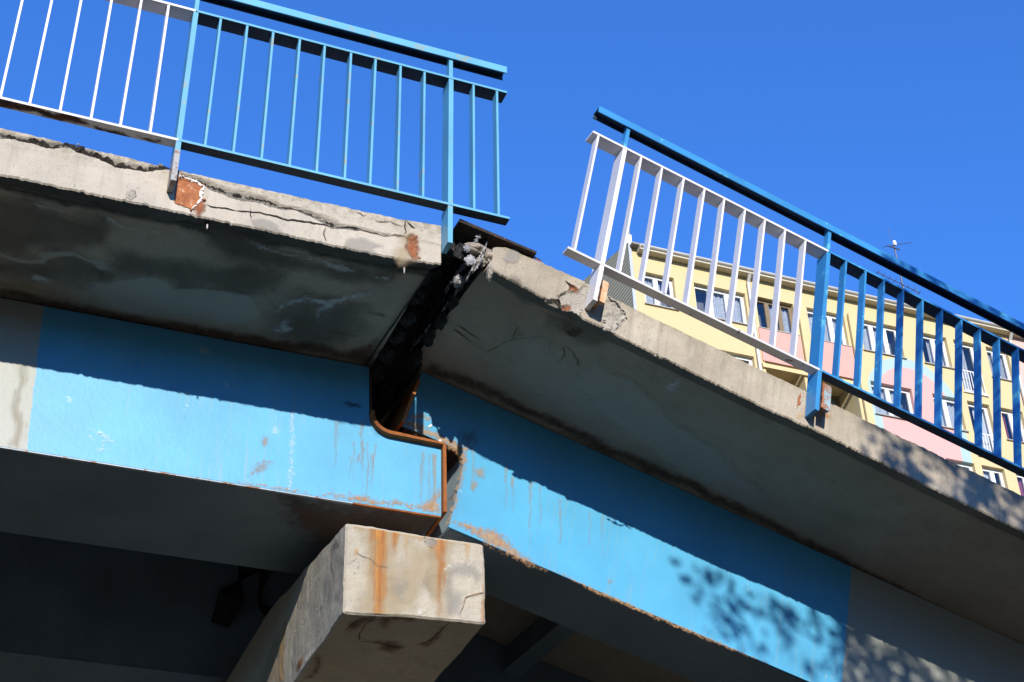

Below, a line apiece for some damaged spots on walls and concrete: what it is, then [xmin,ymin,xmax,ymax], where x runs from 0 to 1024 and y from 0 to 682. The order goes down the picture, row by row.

crack [0,134,415,240]
leakage [0,184,429,295]
spalling [545,280,588,315]
spalling [601,296,628,333]
peeling [329,412,531,564]
corrosion [429,366,908,592]
corrosion [287,495,445,627]
crack [348,592,484,649]
peeling [563,574,737,651]